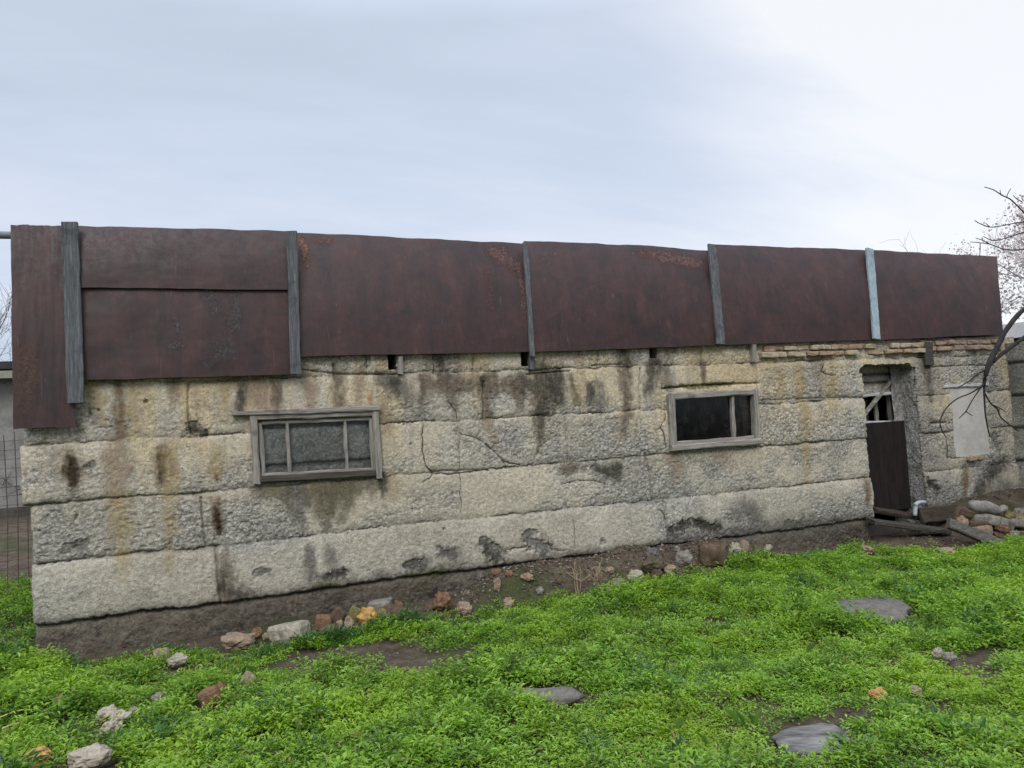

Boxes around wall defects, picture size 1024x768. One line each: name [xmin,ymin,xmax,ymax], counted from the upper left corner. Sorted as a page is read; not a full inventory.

leakage [377,354,564,442]
crack [421,402,527,512]
leakage [304,546,339,587]
leakage [668,503,835,544]